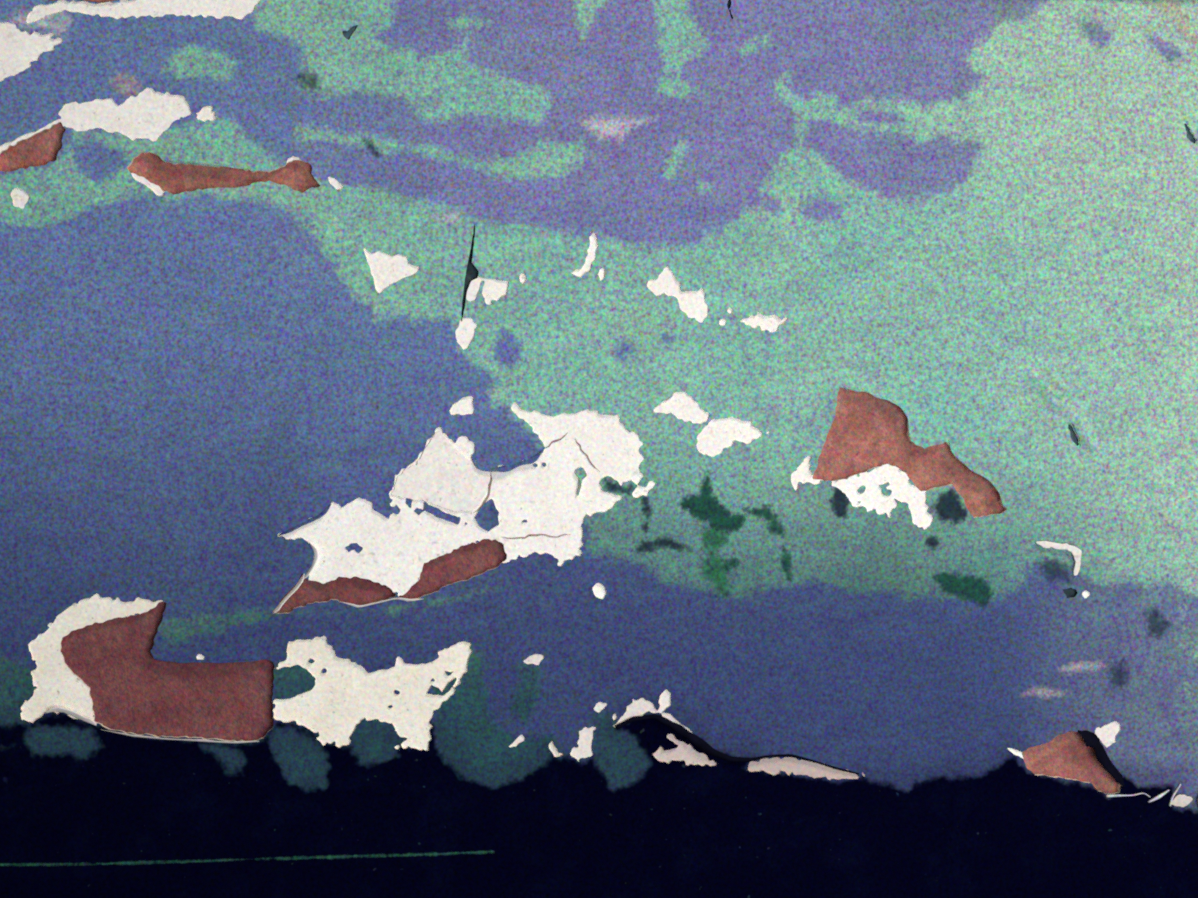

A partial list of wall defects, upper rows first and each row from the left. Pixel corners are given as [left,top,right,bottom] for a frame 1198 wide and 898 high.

peeling [0,0,261,82]
peeling [0,88,344,196]
crack [461,226,478,321]
peeling [647,266,788,332]
peeling [654,392,769,457]
spalling [791,386,1005,529]
peeling [272,403,656,614]
spalling [21,593,472,750]
peeling [549,727,596,761]
peeling [594,689,717,766]
peeling [748,757,865,780]
spalling [1007,721,1125,793]